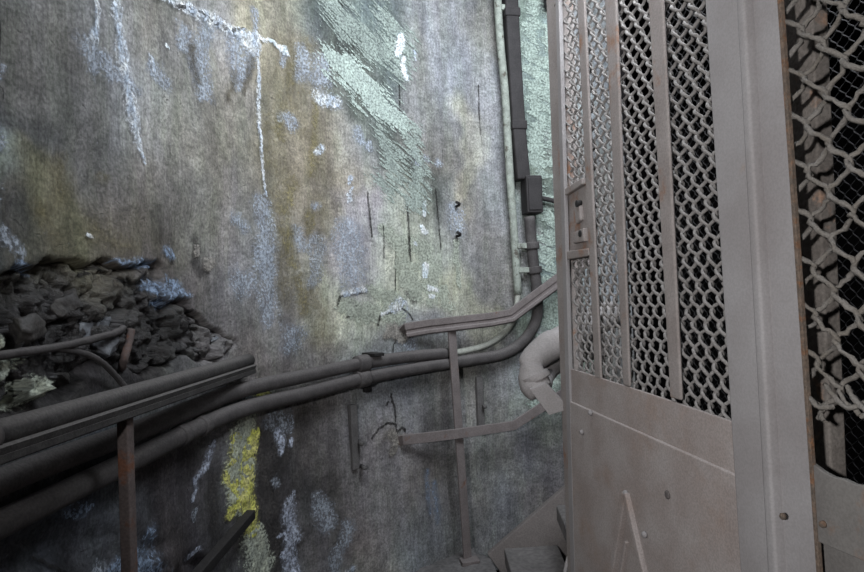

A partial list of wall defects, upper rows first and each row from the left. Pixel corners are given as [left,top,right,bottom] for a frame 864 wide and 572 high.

water stain [82,0,146,164]
crack [164,0,290,101]
water stain [295,46,341,109]
water stain [395,33,417,80]
water stain [422,262,438,298]
crack [371,393,406,456]